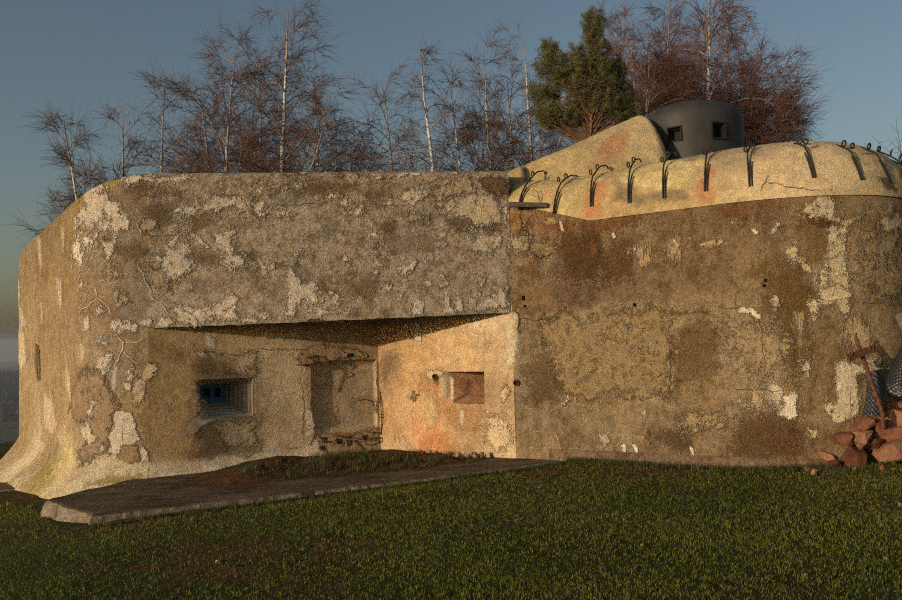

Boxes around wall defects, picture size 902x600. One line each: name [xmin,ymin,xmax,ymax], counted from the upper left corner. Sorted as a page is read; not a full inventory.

crack [79,280,143,368]
peeling [79,352,159,463]
peeling [69,172,365,337]
spalling [294,341,383,455]
crack [506,211,560,333]
water stain [555,221,654,277]
water stain [667,232,691,267]
water stain [669,308,720,382]
peeling [709,195,902,426]